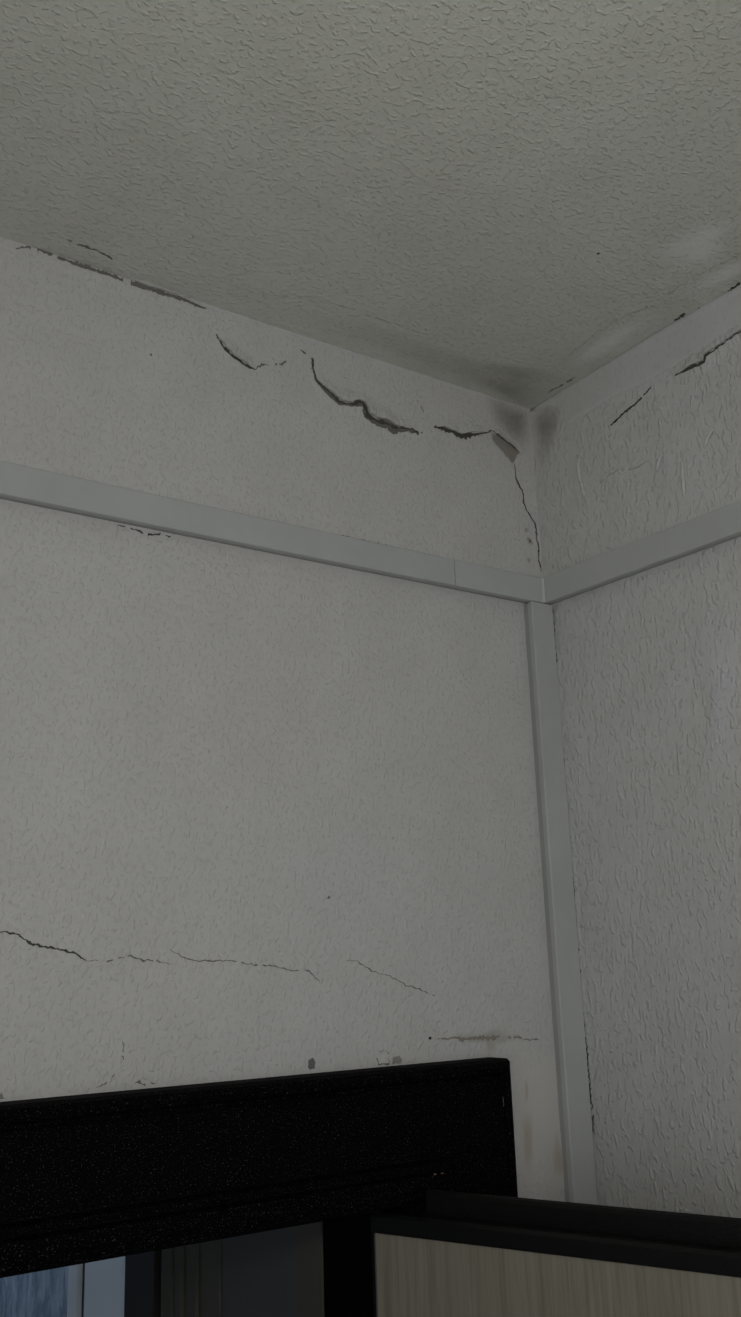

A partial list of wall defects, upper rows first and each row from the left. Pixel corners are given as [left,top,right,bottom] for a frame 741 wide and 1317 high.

crack [209,330,491,444]
crack [610,323,741,426]
crack [0,931,319,981]